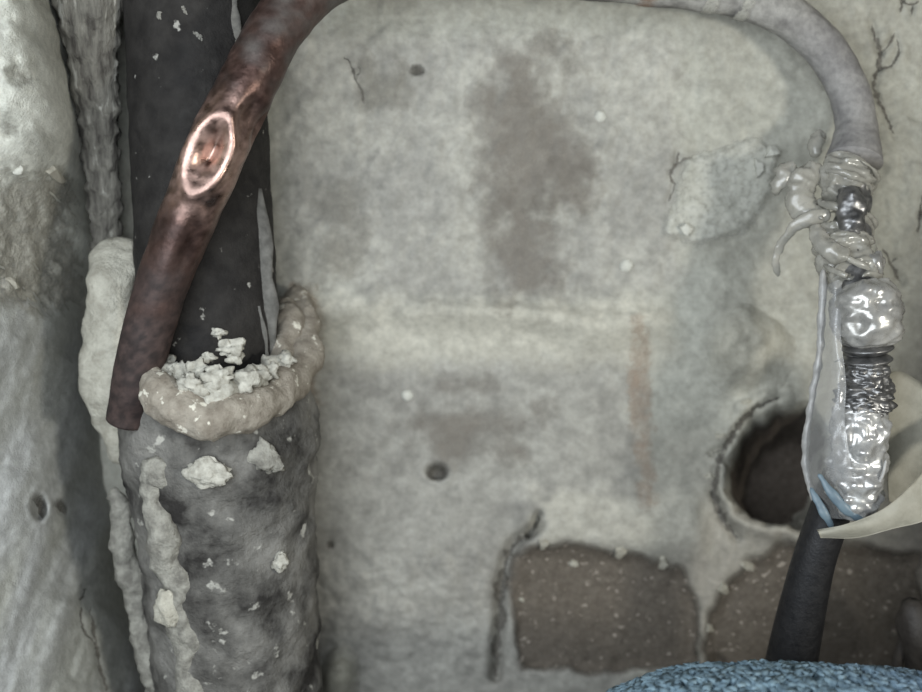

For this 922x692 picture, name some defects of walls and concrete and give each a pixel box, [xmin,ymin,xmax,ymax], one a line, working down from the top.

crack [900,0,919,14]
crack [871,27,900,134]
leakage [485,59,584,288]
crack [914,199,922,233]
spalling [730,411,825,524]
spalling [507,539,796,675]
spalling [818,542,922,666]